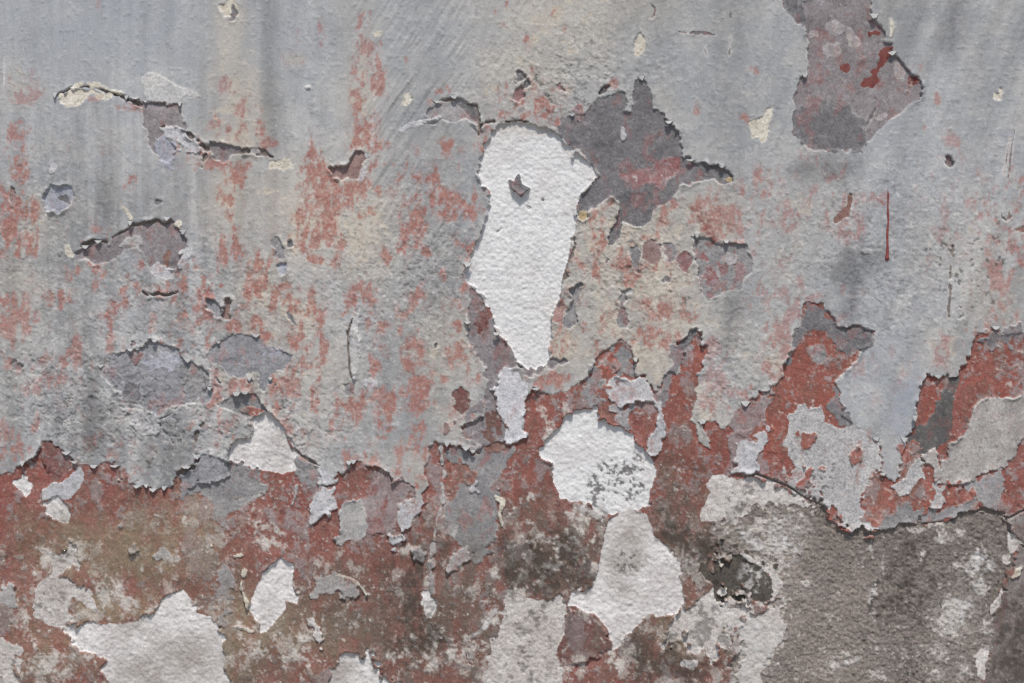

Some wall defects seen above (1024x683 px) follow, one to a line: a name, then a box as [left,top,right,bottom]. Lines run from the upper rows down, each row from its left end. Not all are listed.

peeling [141,72,242,171]
peeling [782,0,923,153]
peeling [43,159,74,214]
peeling [64,206,192,280]
flaking render [452,76,733,448]
peeling [629,233,753,301]
peeling [0,298,1024,683]